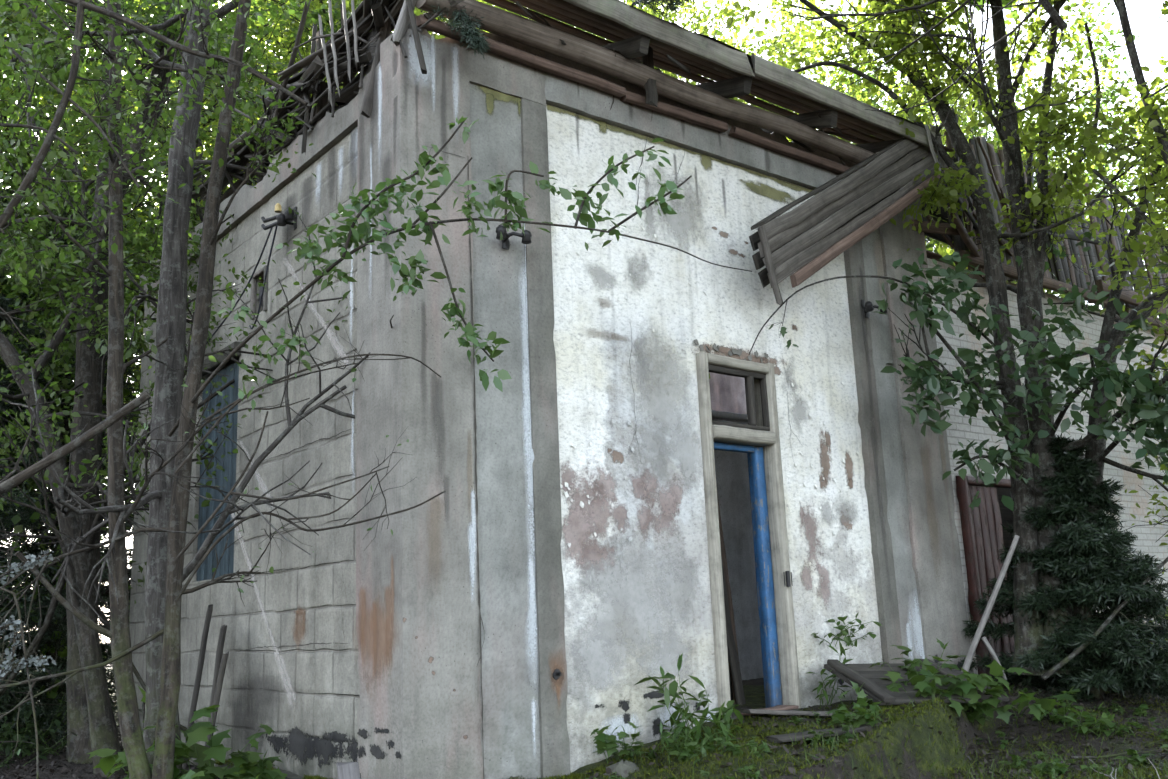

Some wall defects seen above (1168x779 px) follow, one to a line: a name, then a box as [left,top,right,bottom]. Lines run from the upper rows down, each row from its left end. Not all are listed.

damp [410,34,434,90]
damp [522,277,534,500]
peeling [560,447,697,688]
peeling [692,339,860,602]
peeling [266,734,286,753]
peeling [322,729,401,762]